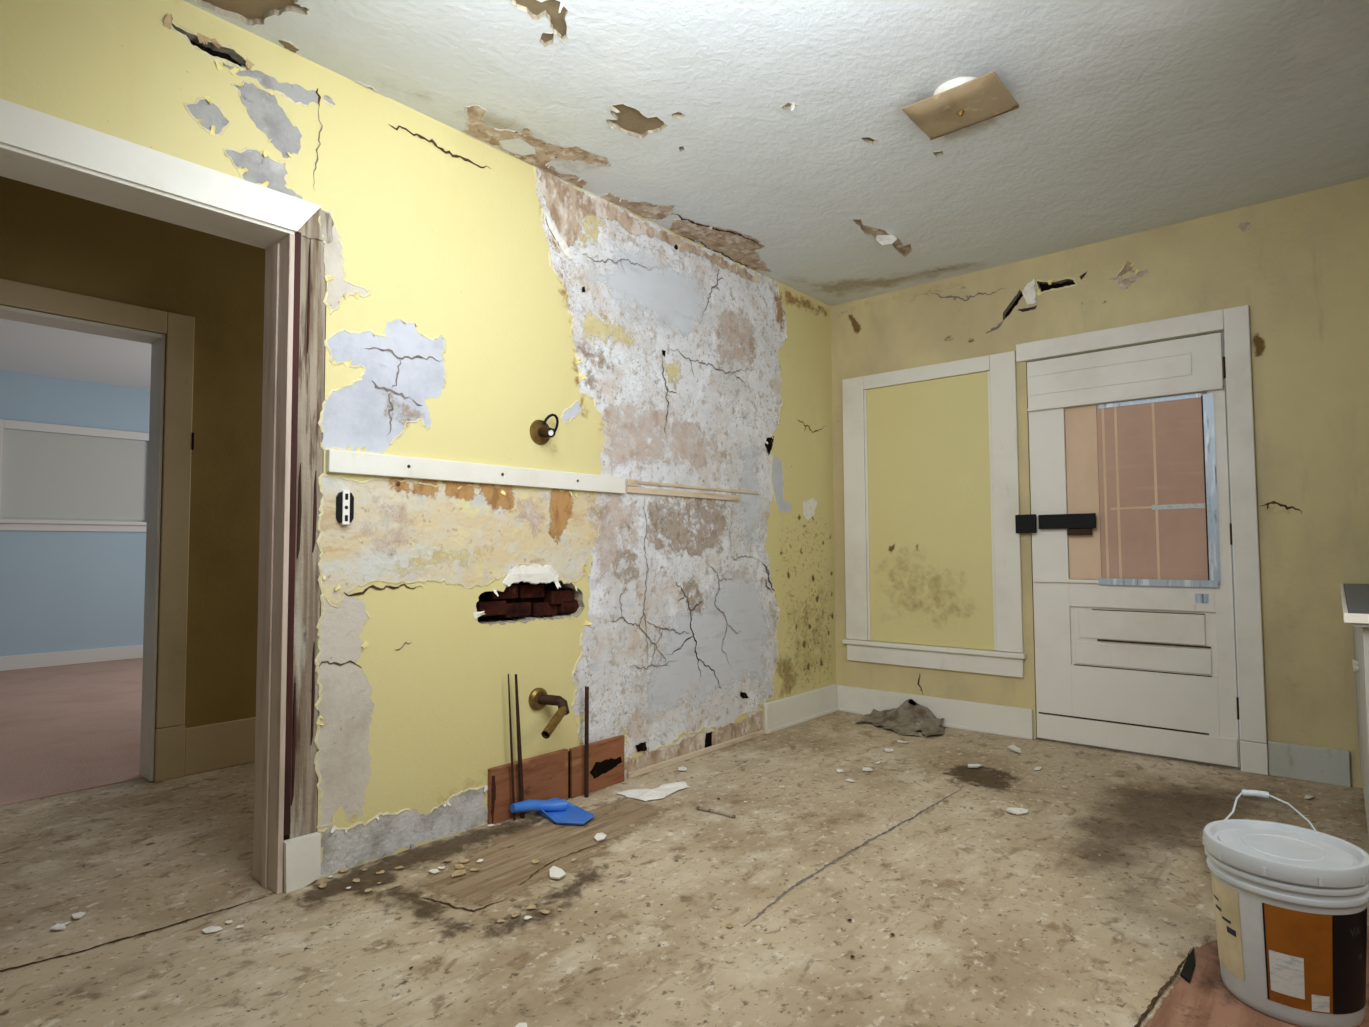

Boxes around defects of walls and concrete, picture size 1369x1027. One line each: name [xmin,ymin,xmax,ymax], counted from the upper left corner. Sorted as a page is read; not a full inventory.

spalling [197,0,310,25]
spalling [510,0,569,47]
crack [313,88,323,190]
crack [389,124,490,168]
peeling [158,14,447,454]
spalling [853,219,912,257]
crack [932,288,1004,334]
peeling [314,104,818,877]
crack [613,500,776,688]
damp [780,515,833,679]